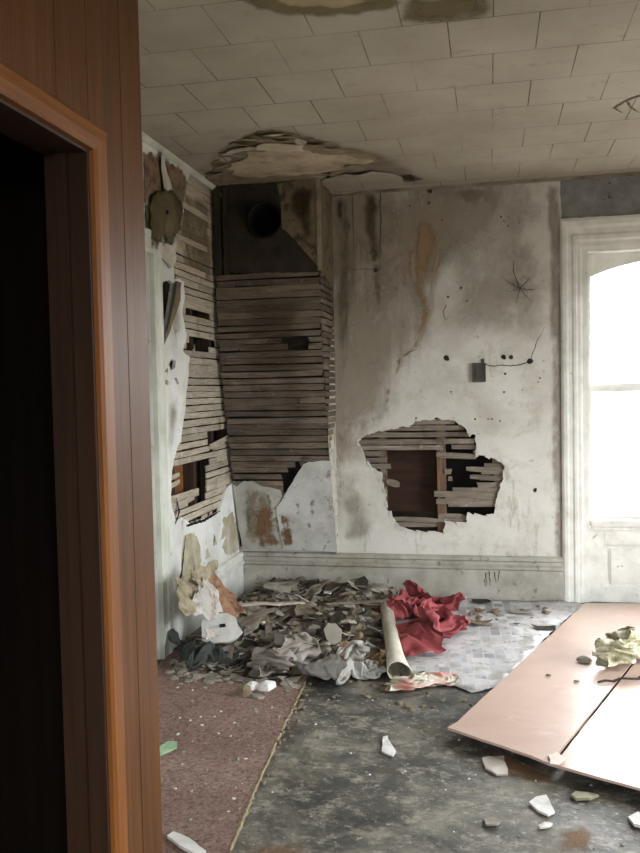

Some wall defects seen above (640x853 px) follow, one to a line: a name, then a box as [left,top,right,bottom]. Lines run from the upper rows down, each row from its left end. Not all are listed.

water stain [246,0,398,16]
water stain [405,0,488,22]
flaking render [156,134,307,523]
water stain [332,175,494,456]
crack [503,261,534,302]
flaking render [357,417,505,534]
peeling [177,512,238,587]
rust [255,507,292,546]